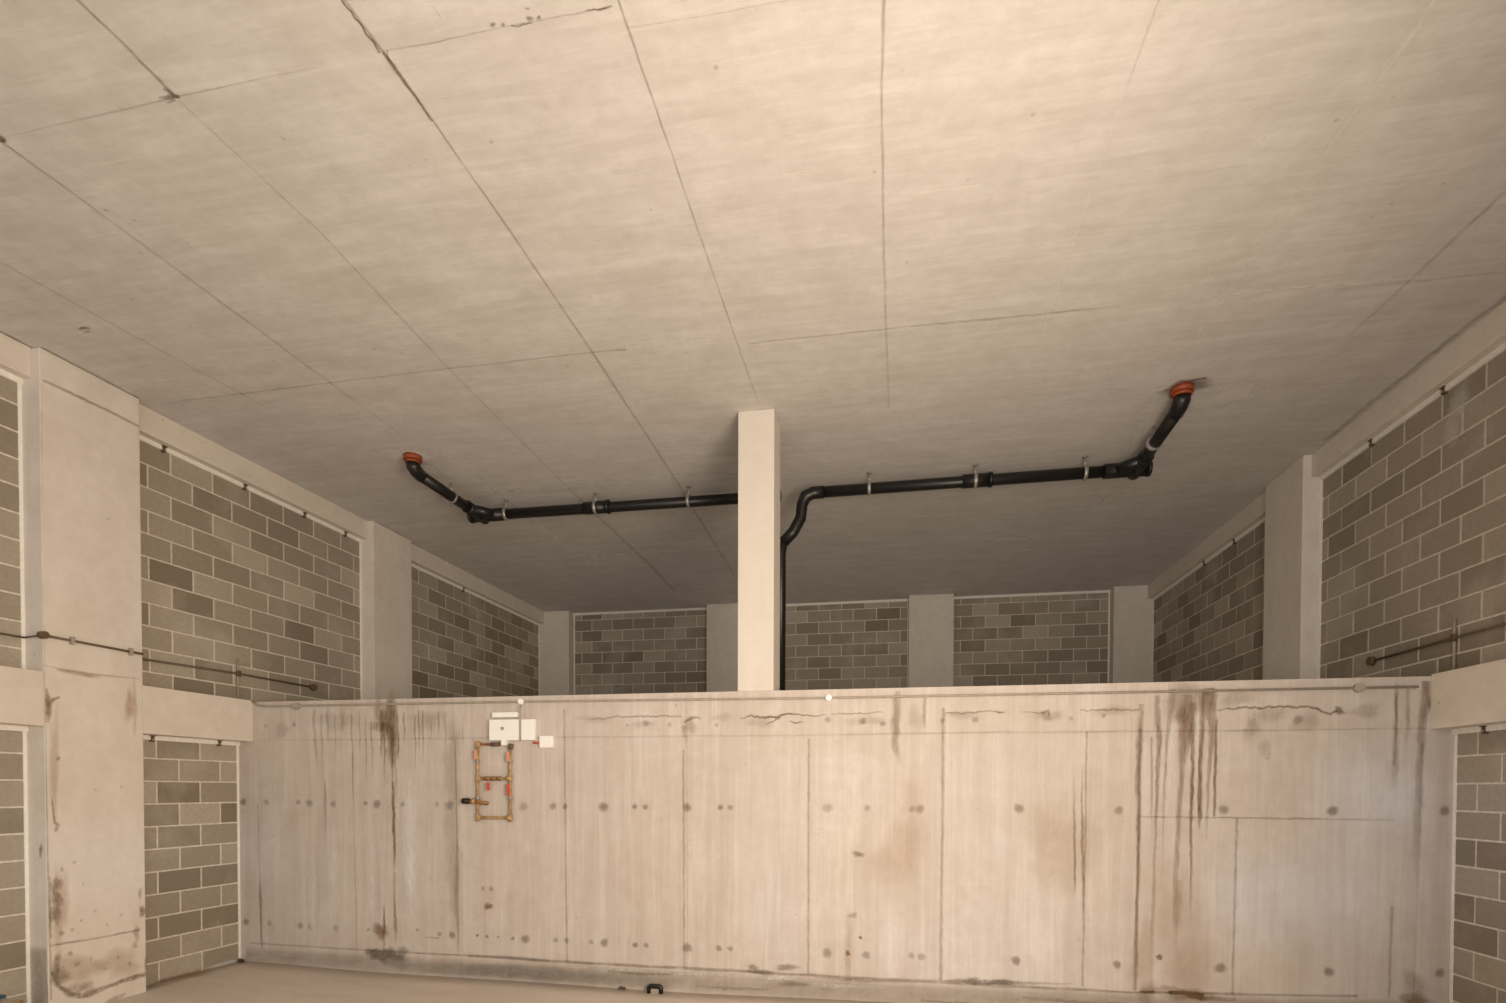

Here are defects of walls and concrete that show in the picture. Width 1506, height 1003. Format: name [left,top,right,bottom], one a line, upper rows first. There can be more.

damp [1158,695,1217,844]